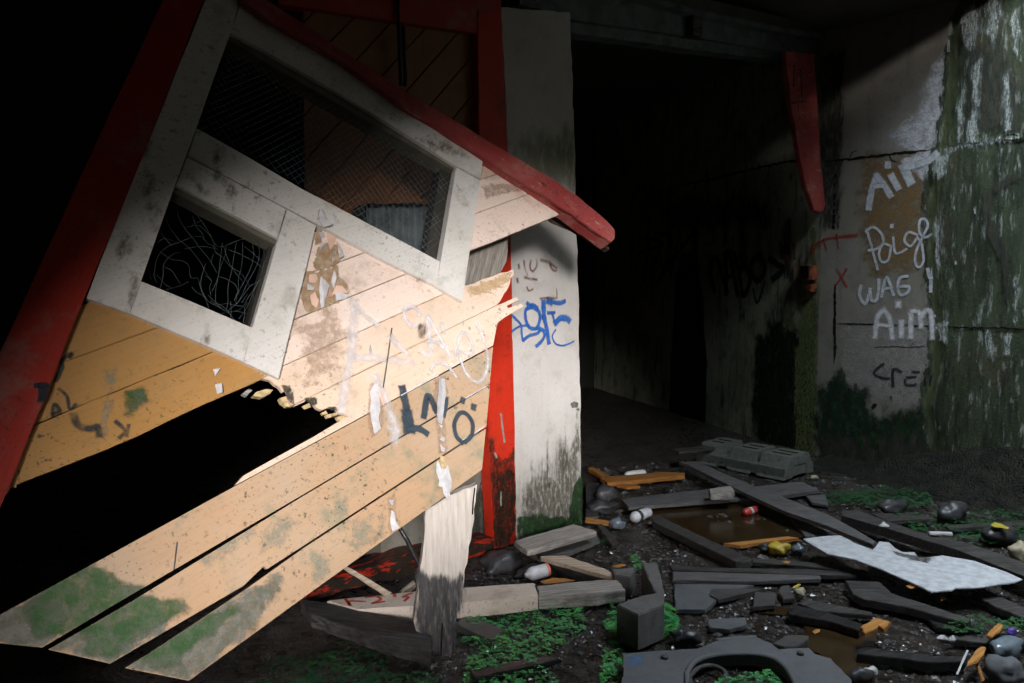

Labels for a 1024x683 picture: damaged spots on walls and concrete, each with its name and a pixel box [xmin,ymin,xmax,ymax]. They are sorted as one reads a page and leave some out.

leakage [892,0,1020,181]
crack [824,134,1024,229]
crack [833,286,1024,360]